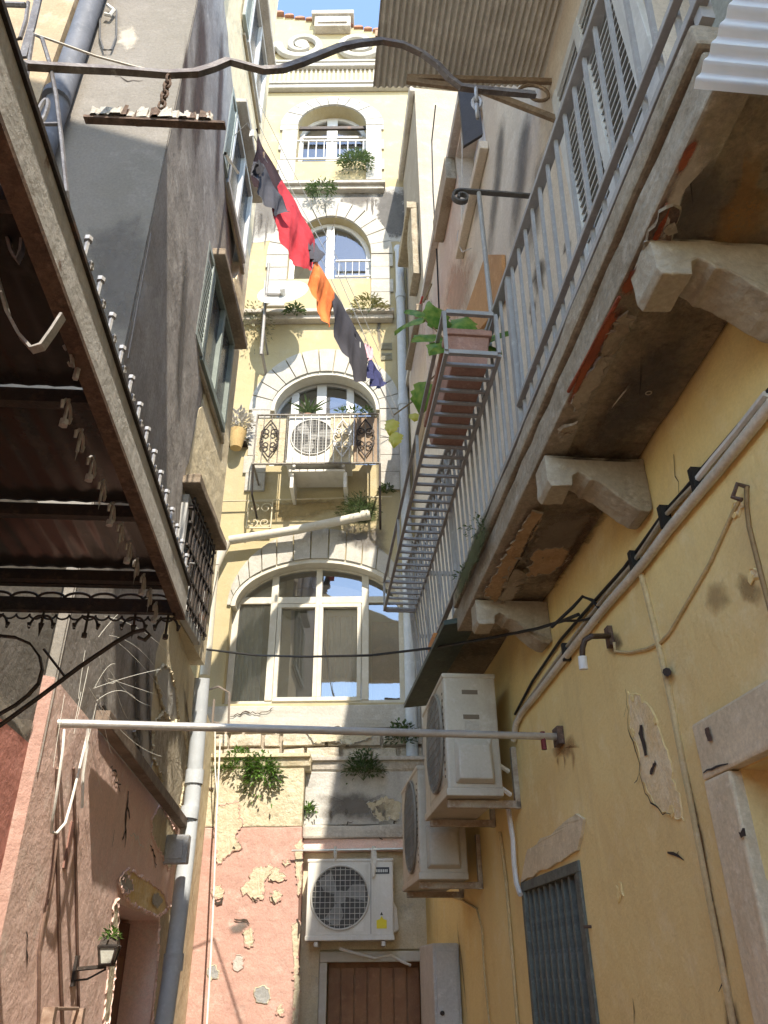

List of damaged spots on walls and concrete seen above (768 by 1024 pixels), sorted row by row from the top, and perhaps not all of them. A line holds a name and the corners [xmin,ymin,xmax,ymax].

rust [567,268,636,402]
spalling [484,510,570,604]
peeling [627,691,685,821]
peeling [214,800,244,866]
peeling [240,838,304,904]
damp [330,794,385,819]
peeling [366,795,402,823]
peeling [102,961,117,1024]
peeling [111,866,172,1024]
peeling [253,920,301,1024]